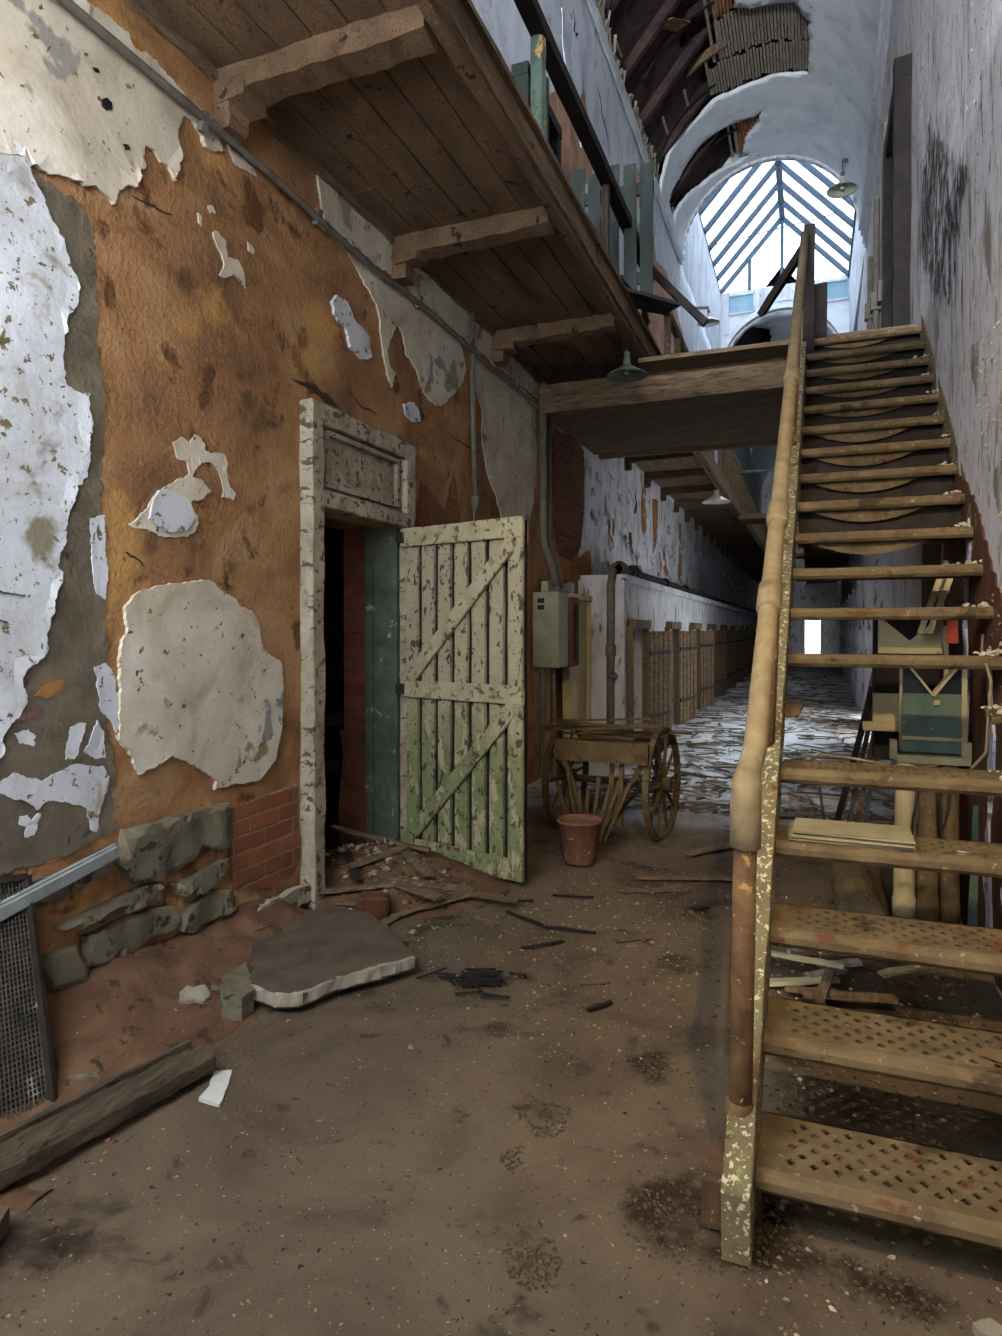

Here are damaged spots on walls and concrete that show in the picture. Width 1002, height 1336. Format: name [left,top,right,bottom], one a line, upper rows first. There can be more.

peeling [0,0,312,912]
peeling [316,168,742,605]
peeling [912,0,1002,533]
spalling [922,437,1002,771]
spalling [956,794,1002,855]
spalling [960,874,1002,953]